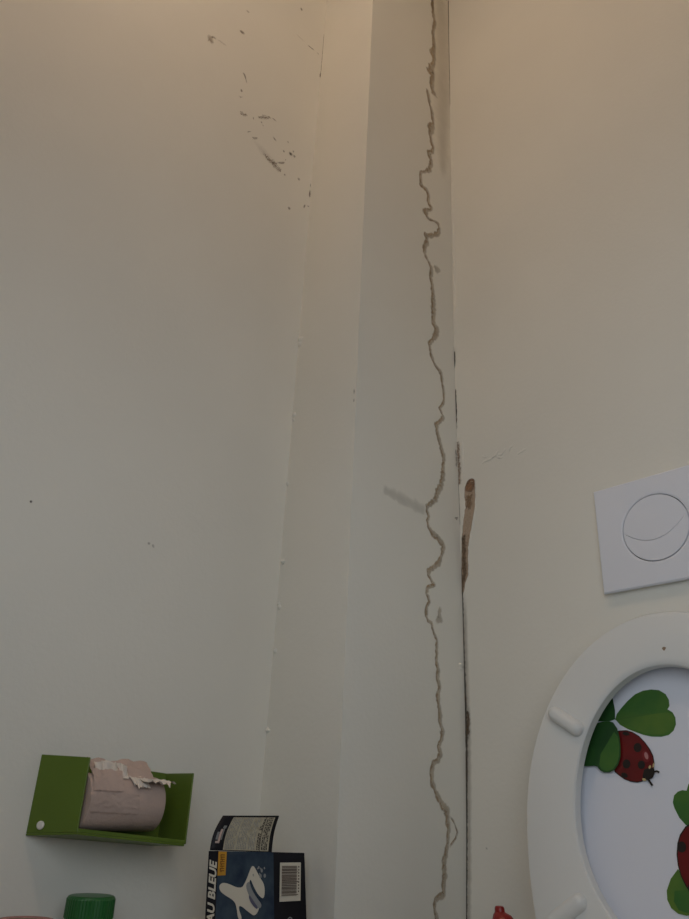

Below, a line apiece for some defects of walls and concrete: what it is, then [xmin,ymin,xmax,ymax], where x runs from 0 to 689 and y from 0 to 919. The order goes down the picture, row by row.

crack [462,594,470,919]